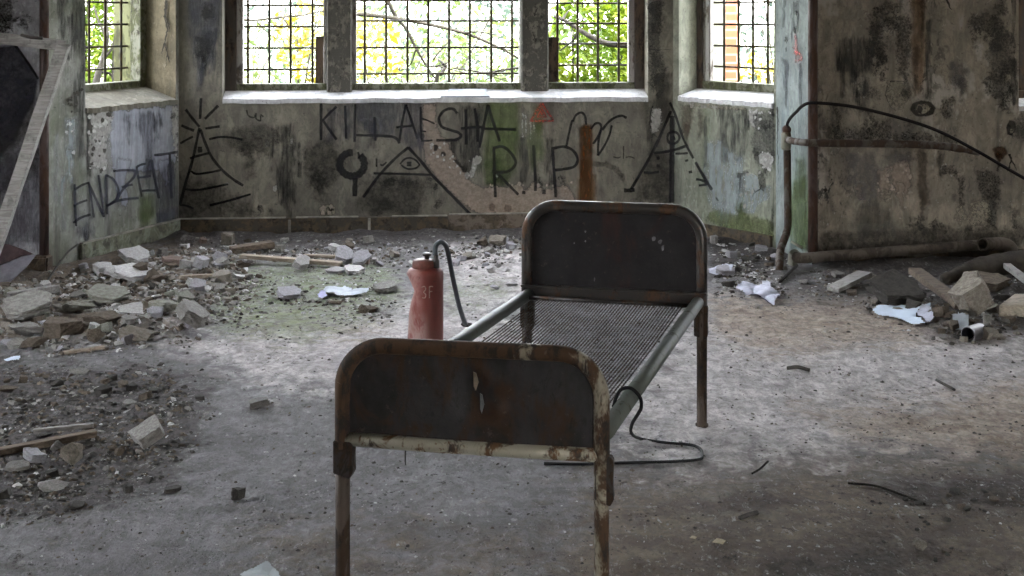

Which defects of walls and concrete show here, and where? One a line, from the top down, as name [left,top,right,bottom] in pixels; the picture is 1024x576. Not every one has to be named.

leakage [189,0,221,89]
peeling [61,88,114,203]
peeling [422,103,575,213]
leakage [821,0,1024,251]